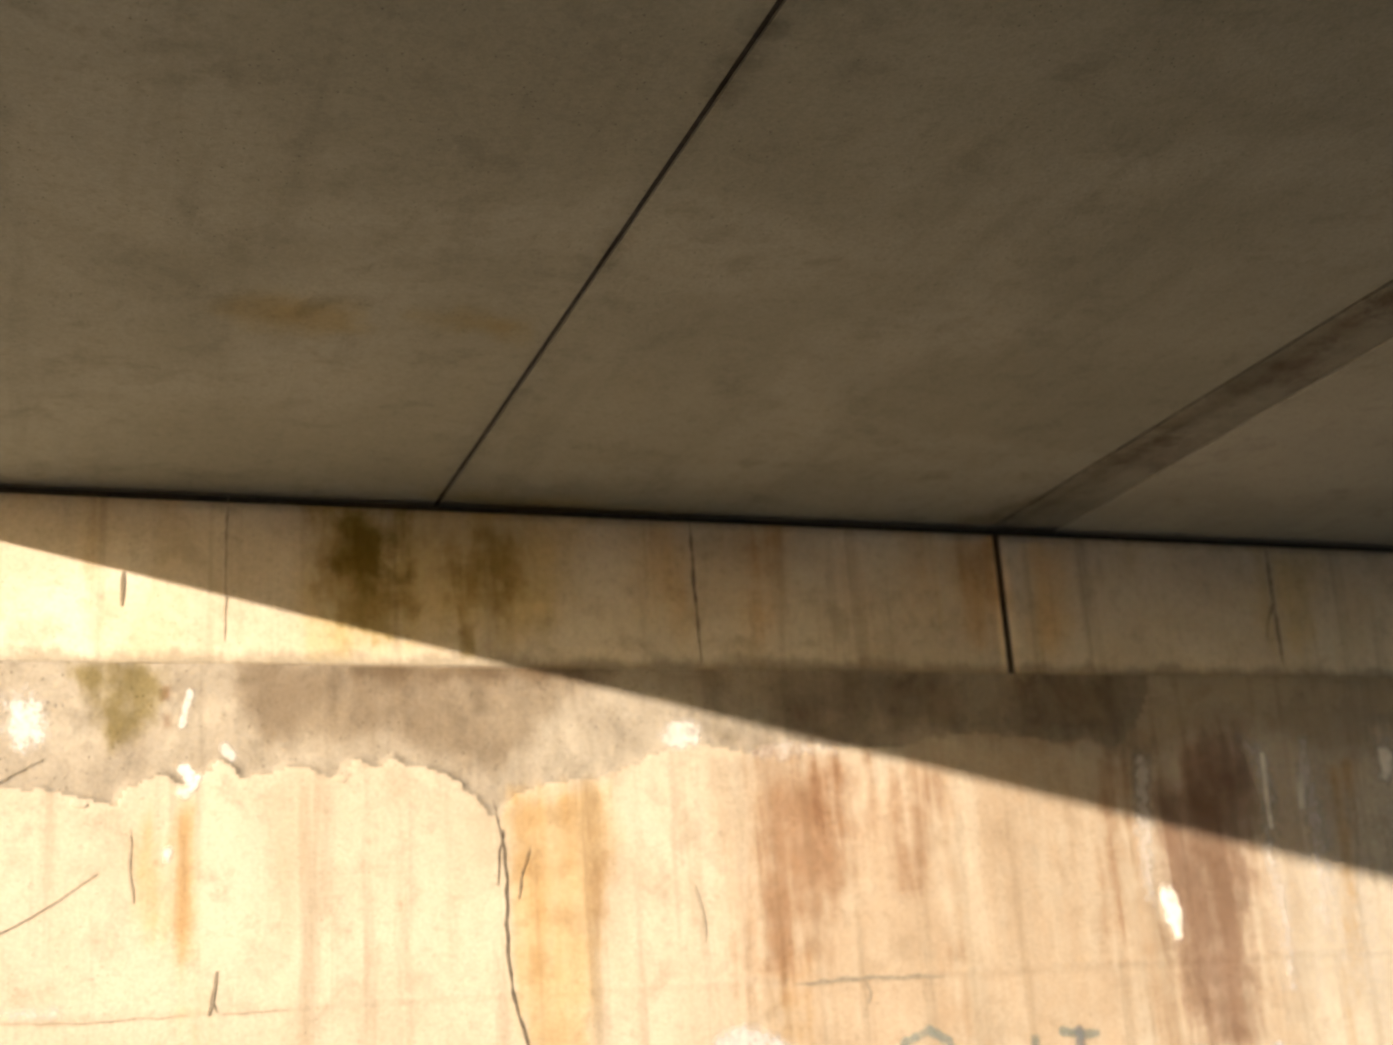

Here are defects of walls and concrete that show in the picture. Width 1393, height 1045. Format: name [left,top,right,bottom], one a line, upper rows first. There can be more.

leakage [4,697,45,752]
leakage [178,689,193,728]
leakage [177,764,201,798]
leakage [221,743,236,762]
leakage [1258,751,1275,829]
leakage [1378,746,1393,784]
crack [493,800,530,1045]
leakage [1160,884,1184,940]